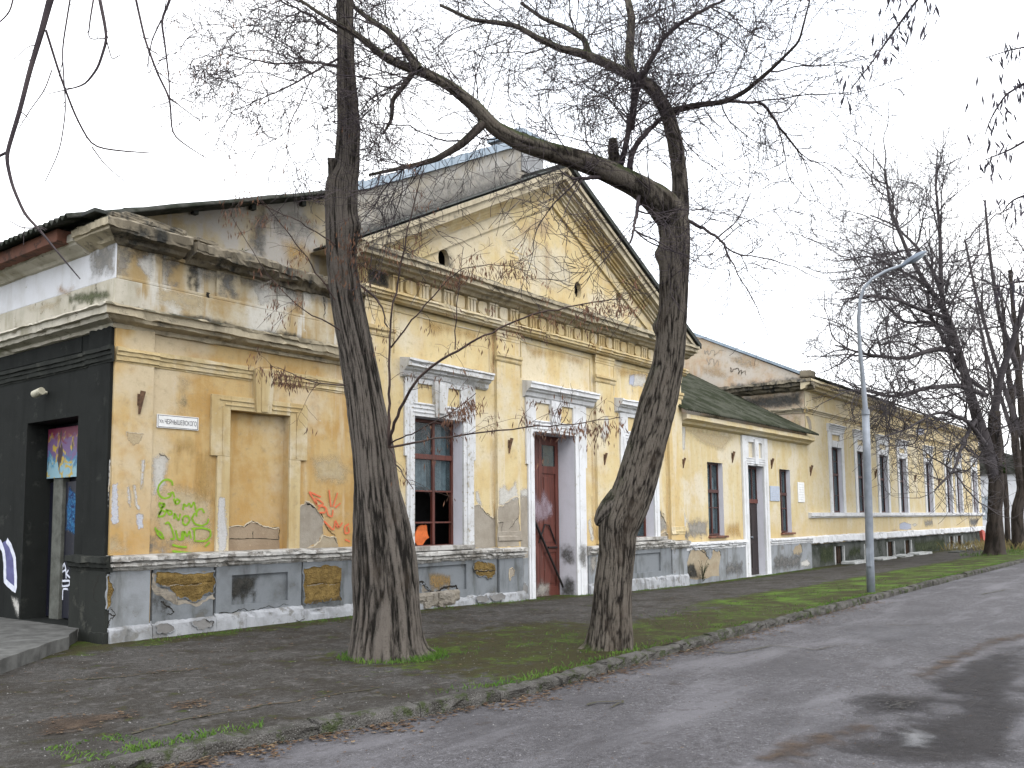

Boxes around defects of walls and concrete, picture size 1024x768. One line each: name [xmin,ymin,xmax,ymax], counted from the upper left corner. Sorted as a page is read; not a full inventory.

flaking render [217,497,280,551]
flaking render [300,501,339,548]
flaking render [472,495,528,580]
flaking render [151,570,217,607]
flaking render [302,564,342,606]
flaking render [687,548,721,580]